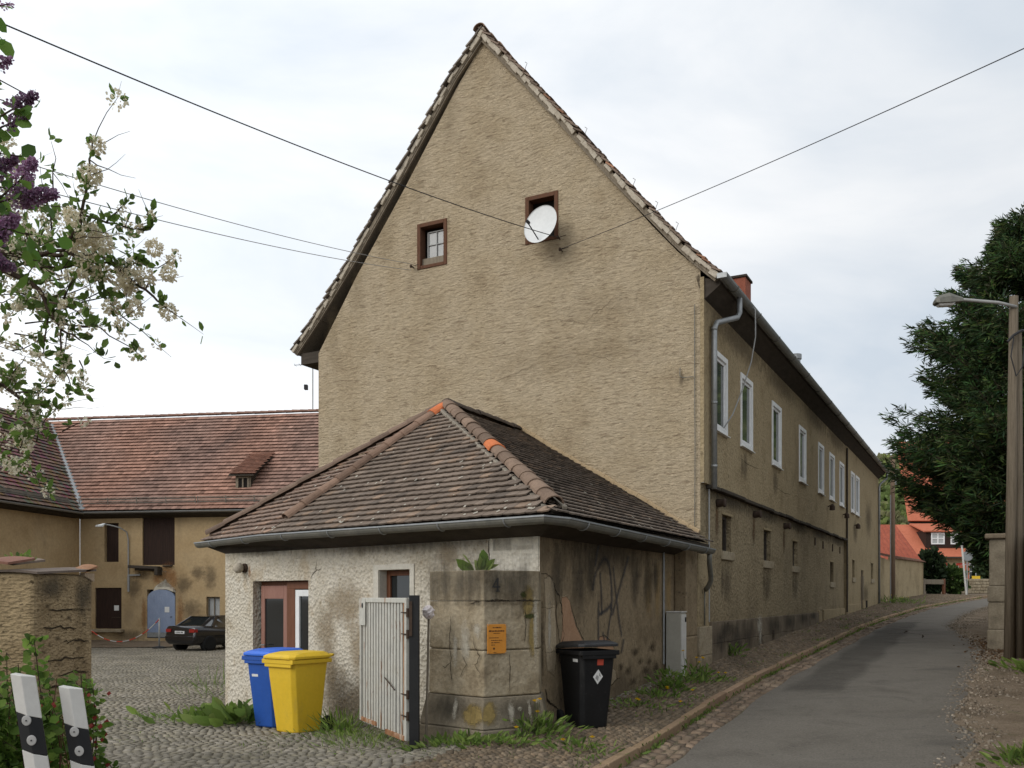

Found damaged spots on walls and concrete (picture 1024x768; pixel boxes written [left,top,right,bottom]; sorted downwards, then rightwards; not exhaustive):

crack [443,624,480,679]
flaking render [485,576,584,676]
crack [541,573,564,664]